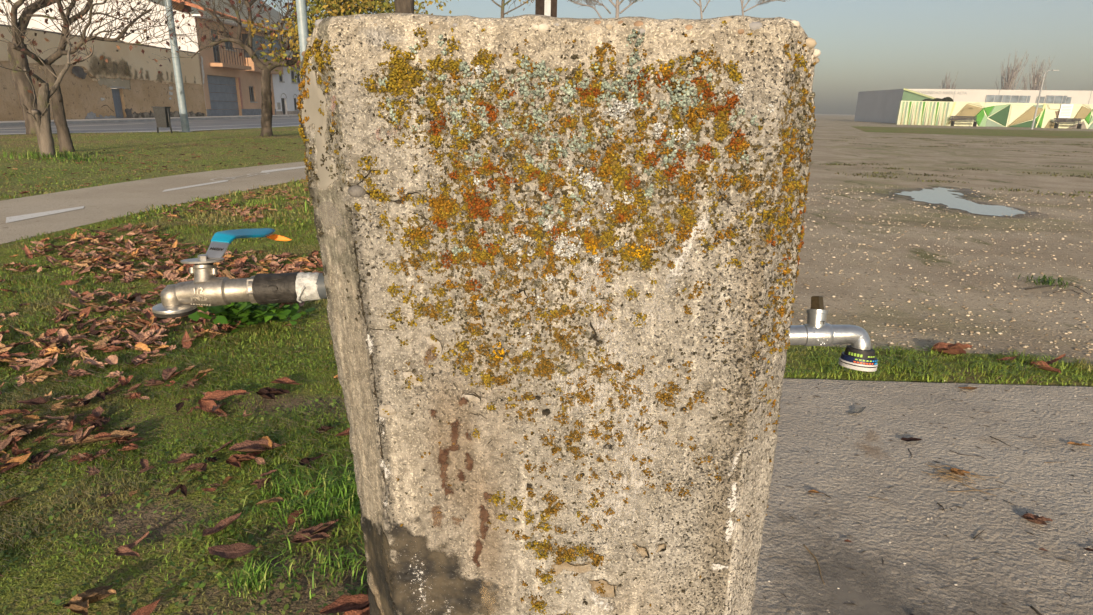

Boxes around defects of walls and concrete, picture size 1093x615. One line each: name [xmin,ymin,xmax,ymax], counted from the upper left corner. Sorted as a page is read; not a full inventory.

rust [432,420,474,527]
damp [360,496,498,615]
rust [472,492,493,567]